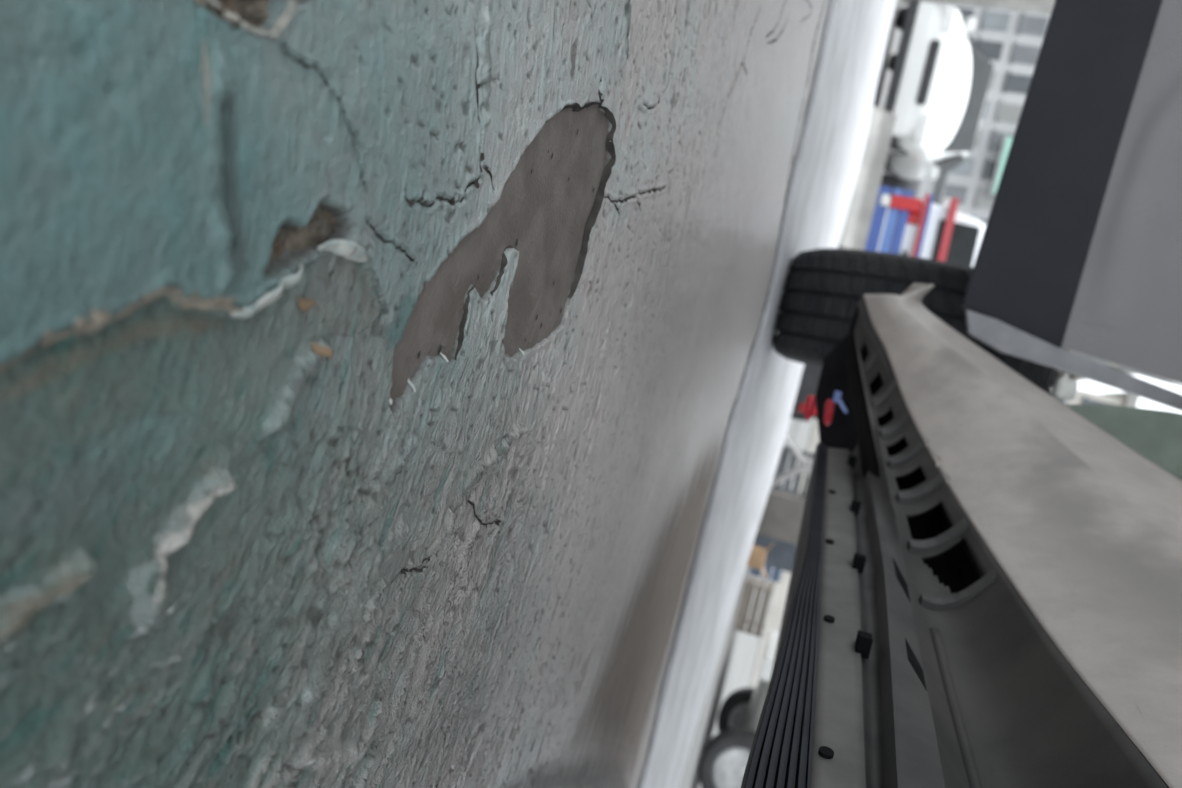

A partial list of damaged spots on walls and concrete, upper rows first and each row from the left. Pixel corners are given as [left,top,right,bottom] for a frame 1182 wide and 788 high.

spalling [195,0,300,39]
crack [604,170,672,223]
crack [366,220,415,261]
peeling [389,102,616,409]
crack [467,500,502,533]